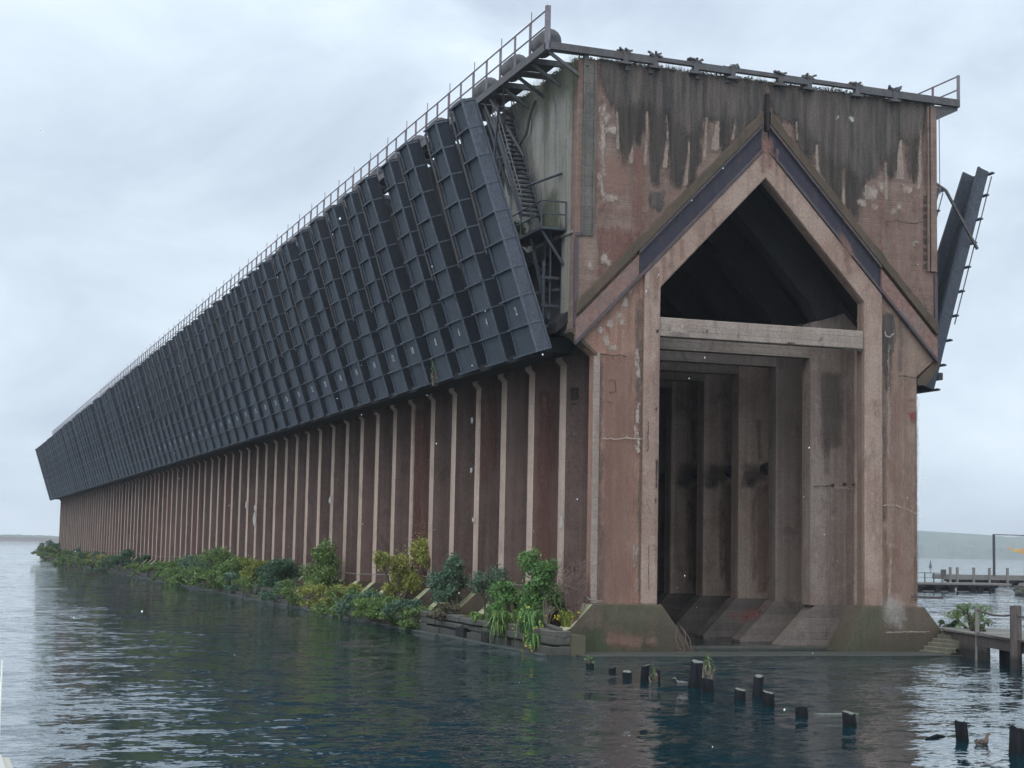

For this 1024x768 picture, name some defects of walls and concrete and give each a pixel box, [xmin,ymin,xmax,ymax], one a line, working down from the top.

peeling [597,104,649,202]
peeling [702,118,736,160]
damp [598,57,928,221]
peeling [842,132,927,269]
damp [823,374,840,457]